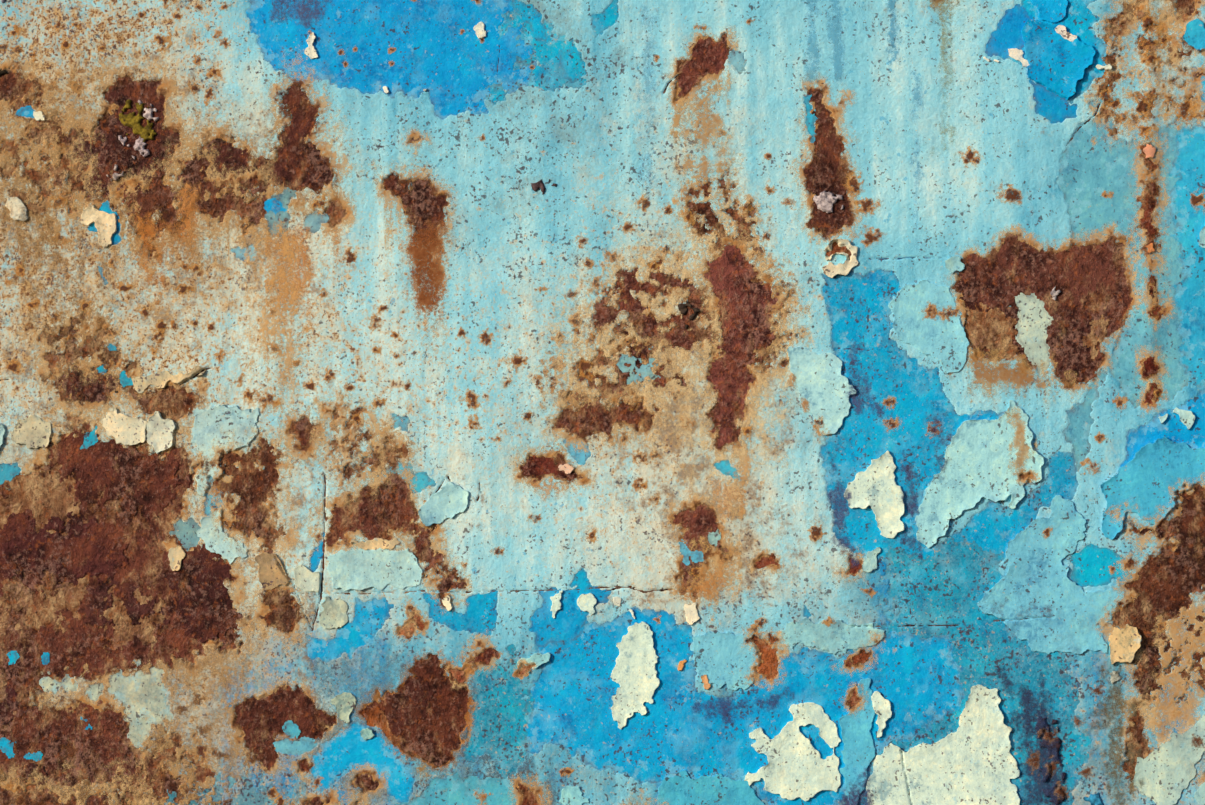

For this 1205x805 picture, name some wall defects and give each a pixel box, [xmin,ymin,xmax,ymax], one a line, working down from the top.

corrosion [0,22,503,805]
corrosion [504,25,810,621]
peeling [246,0,1205,805]
corrosion [801,399,830,436]
corrosion [807,521,825,542]
corrosion [765,78,882,260]
corrosion [835,551,876,598]
corrosion [924,0,1205,483]
corrosion [1099,477,1205,791]